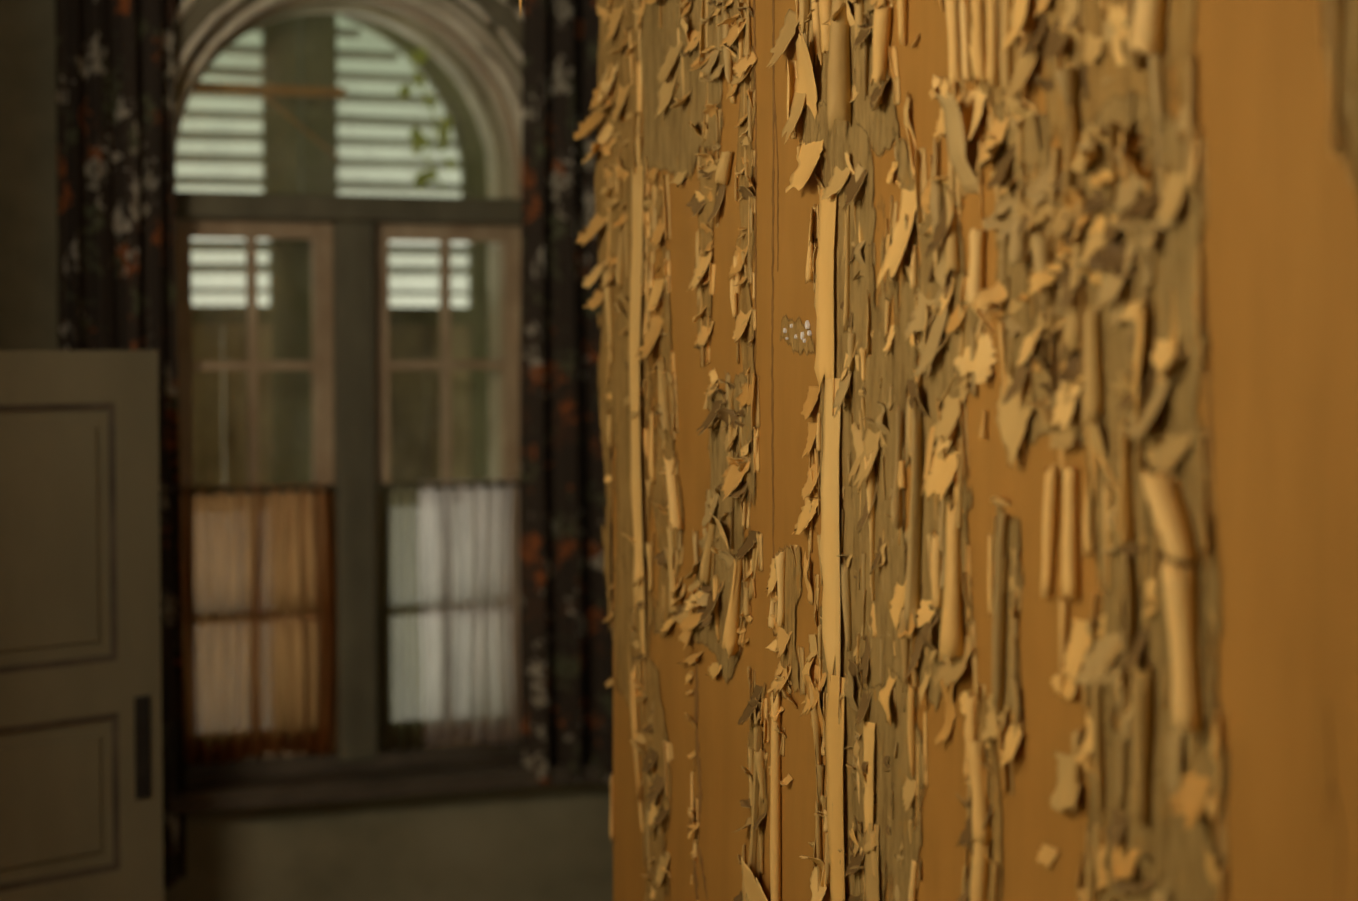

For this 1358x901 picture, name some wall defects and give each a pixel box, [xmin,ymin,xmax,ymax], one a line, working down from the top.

peeling [574,0,1228,901]
peeling [1319,0,1358,189]